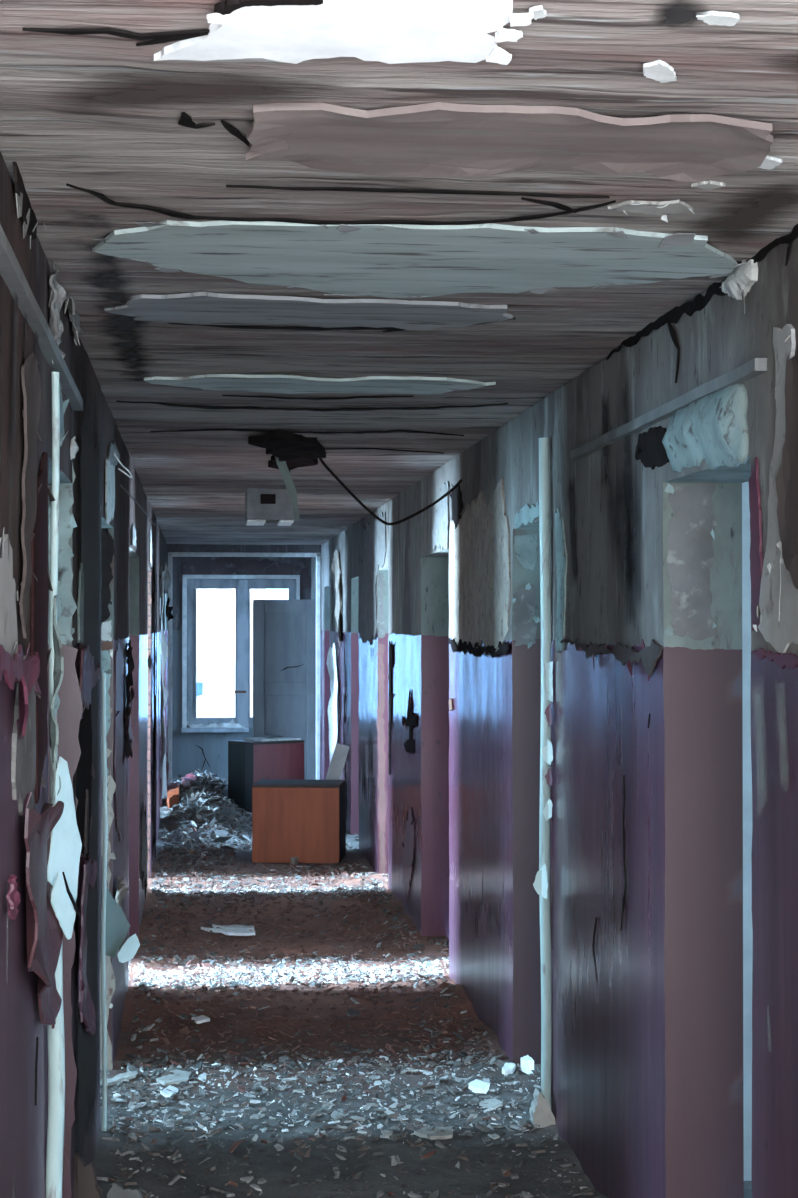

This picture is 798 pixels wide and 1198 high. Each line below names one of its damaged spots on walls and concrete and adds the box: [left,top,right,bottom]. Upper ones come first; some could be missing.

spalling [154,0,547,65]
peeling [696,11,740,26]
peeling [643,59,677,83]
crack [66,183,616,225]
peeling [432,478,541,658]
peeling [541,508,663,821]
peeling [0,260,174,1198]